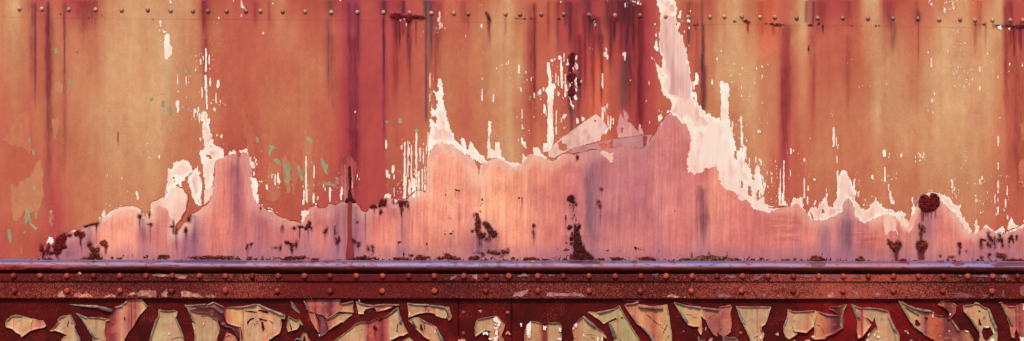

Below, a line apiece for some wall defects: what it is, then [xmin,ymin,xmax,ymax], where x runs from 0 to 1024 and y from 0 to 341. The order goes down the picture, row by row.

corrosion [383,1,427,75]
corrosion [515,1,619,110]
peeling [7,0,1024,261]
corrosion [40,222,170,260]
corrosion [370,198,409,215]
corrosion [393,198,536,260]
corrosion [557,195,624,261]
corrosion [887,193,940,261]
corrosion [979,232,1024,261]
peeling [5,274,452,341]
peeling [458,310,505,341]
peeling [520,274,1024,341]